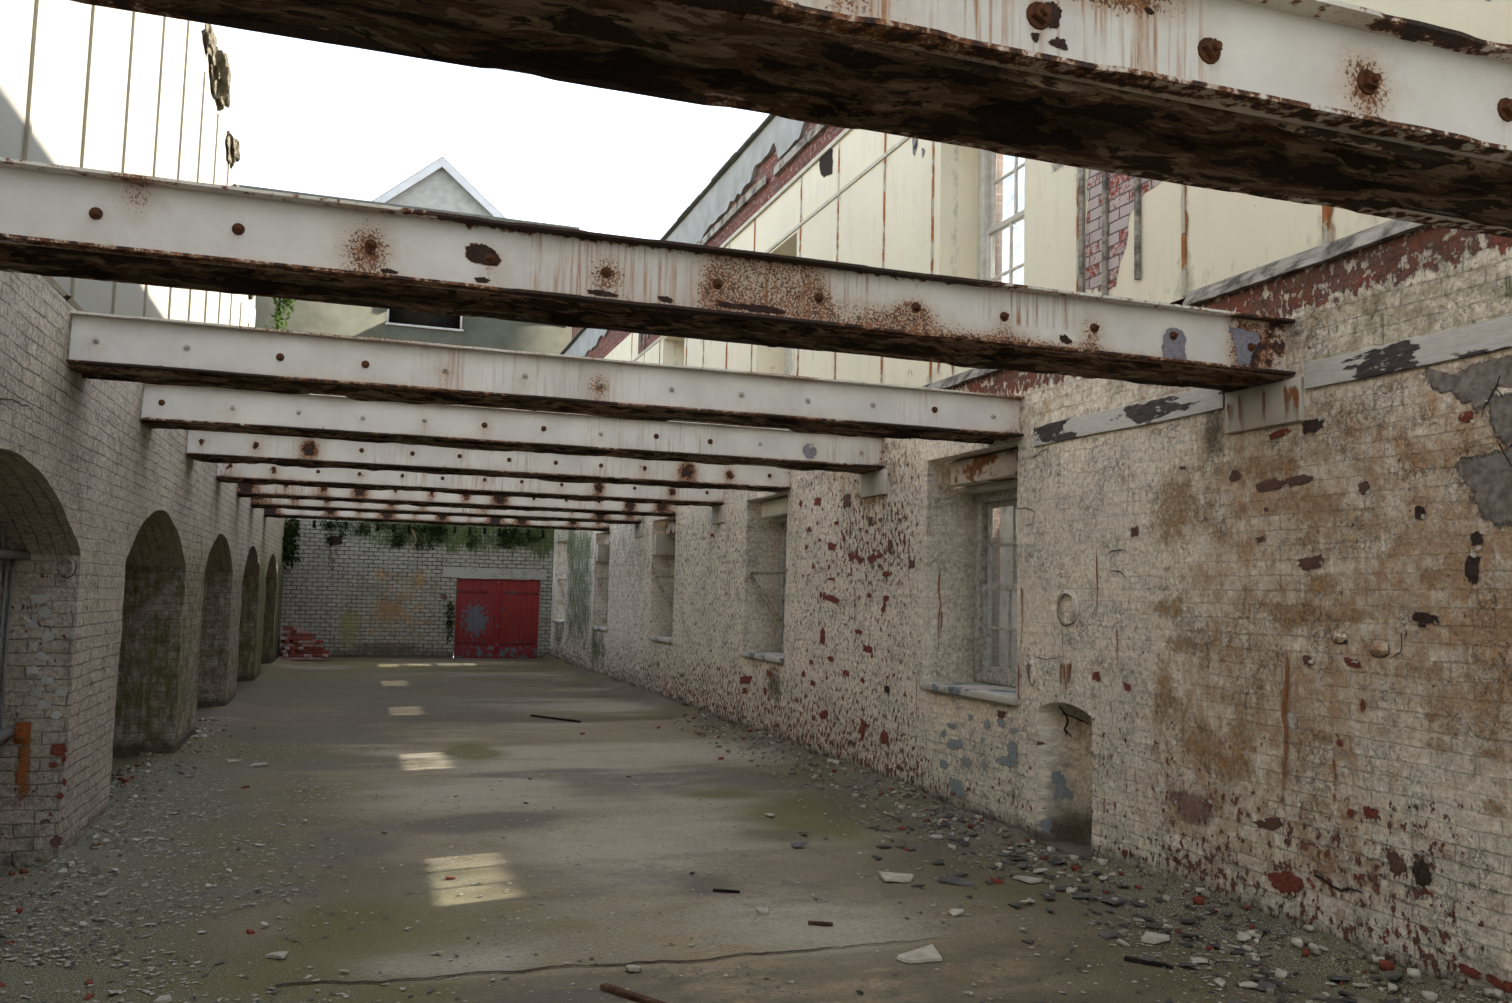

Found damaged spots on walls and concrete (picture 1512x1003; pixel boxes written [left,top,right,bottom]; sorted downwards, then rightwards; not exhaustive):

corrosion [1031,1,1068,50]
flaking render [1084,169,1161,293]
corrosion [464,242,502,283]
corrosion [587,289,619,297]
corrosion [714,299,786,314]
flaking render [1420,353,1512,585]
water stain [1151,477,1192,544]
spalling [805,493,893,612]
water stain [1154,597,1183,616]
spalling [801,625,865,686]
corrosion [14,744,31,801]
peeling [940,709,1019,798]